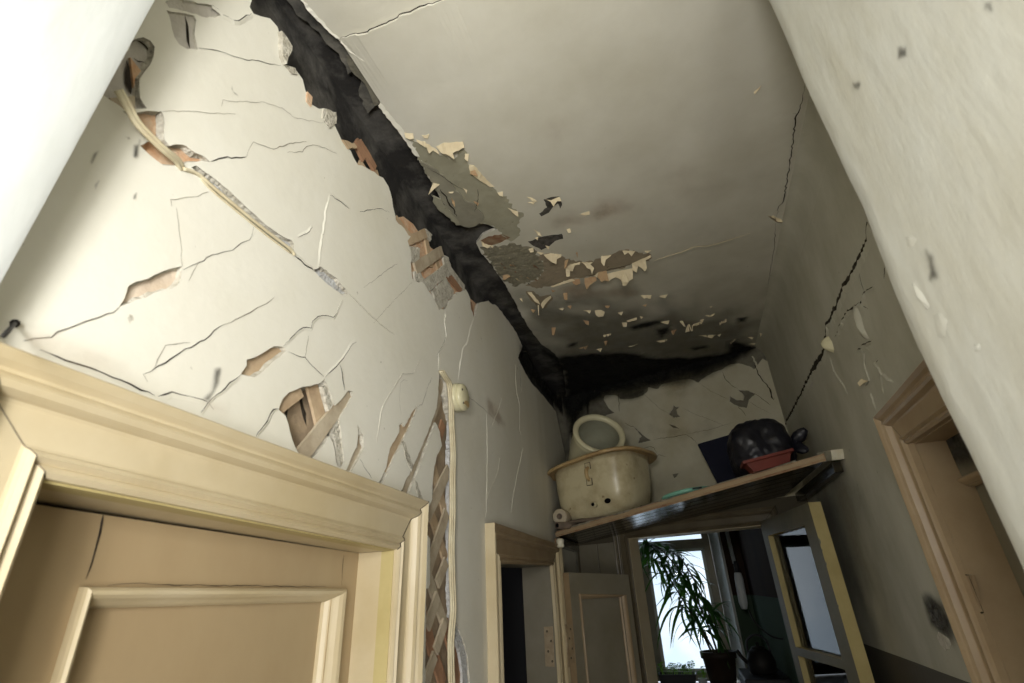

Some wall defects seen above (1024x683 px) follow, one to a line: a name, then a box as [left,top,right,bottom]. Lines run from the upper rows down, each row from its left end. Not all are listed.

crack [340,0,483,103]
flaking render [103,39,293,254]
crack [164,100,332,162]
peeling [287,0,668,327]
crack [25,300,271,415]
flaking render [119,267,180,307]
flaking render [241,347,284,377]
flaking render [279,381,363,471]
crack [284,264,405,391]
damp [521,321,755,438]
crack [618,222,894,441]
flaking render [379,373,469,683]